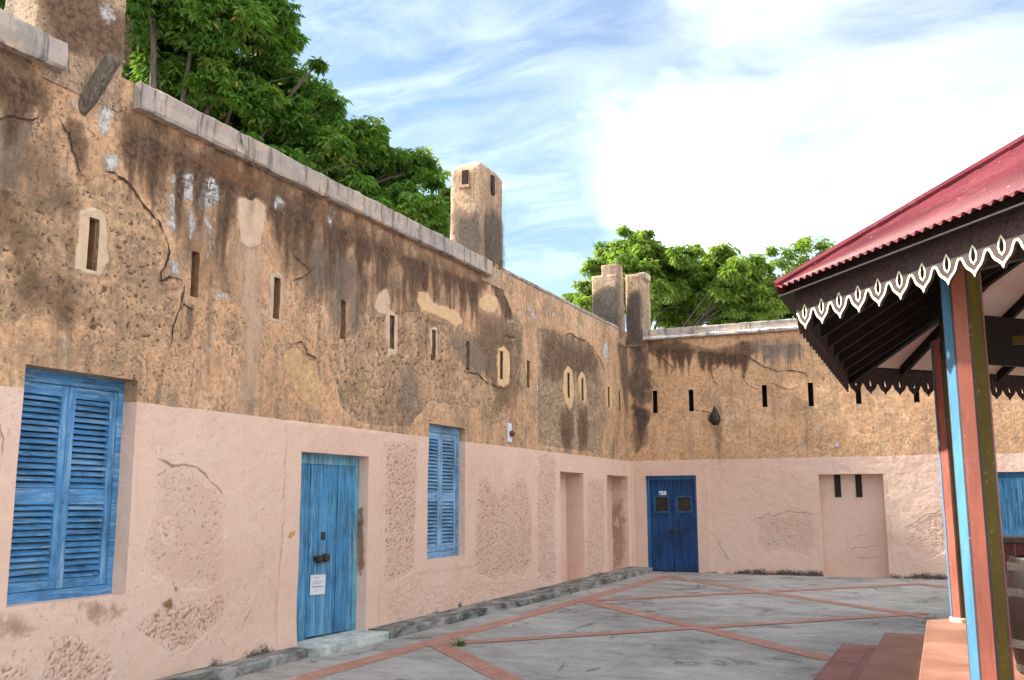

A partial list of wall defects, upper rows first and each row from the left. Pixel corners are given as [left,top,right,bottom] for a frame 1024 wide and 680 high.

water stain [68,120,86,165]
crack [0,115,193,347]
water stain [125,112,519,402]
water stain [544,335,593,376]
water stain [591,285,800,448]
water stain [561,411,587,448]
crack [157,458,223,494]